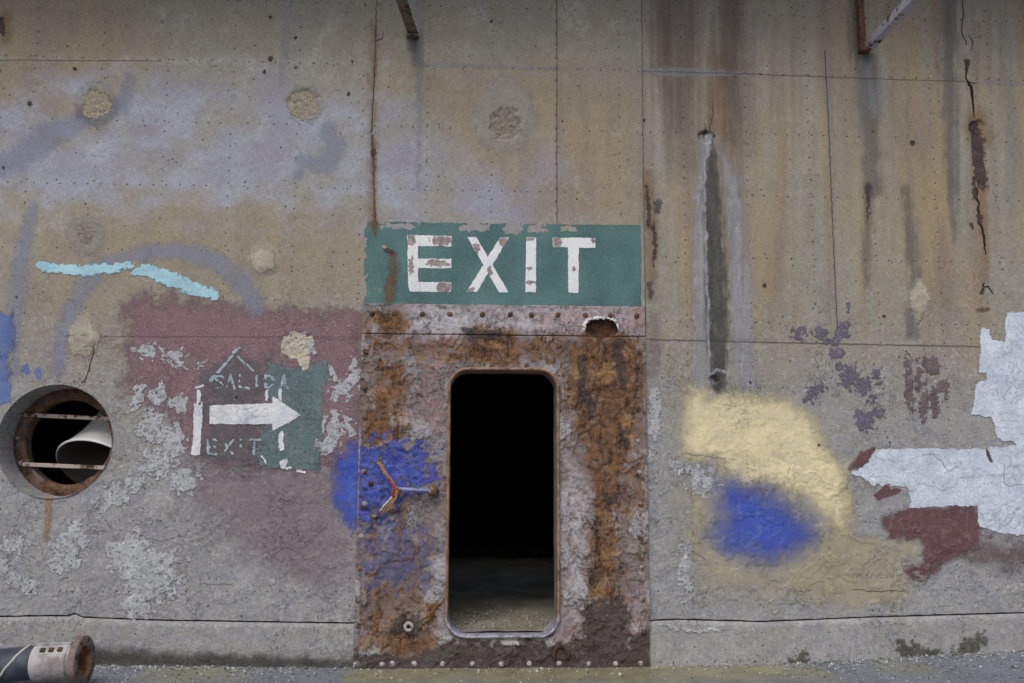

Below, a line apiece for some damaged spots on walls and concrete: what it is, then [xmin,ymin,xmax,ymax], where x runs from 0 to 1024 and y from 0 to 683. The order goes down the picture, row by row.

corrosion [372,214,397,303]
water stain [692,130,756,395]
crack [641,0,980,347]
crack [976,188,986,254]
peeling [130,341,210,374]
spalling [281,331,317,371]
peeling [313,356,361,456]
peeling [788,302,950,433]
peeling [0,380,209,621]